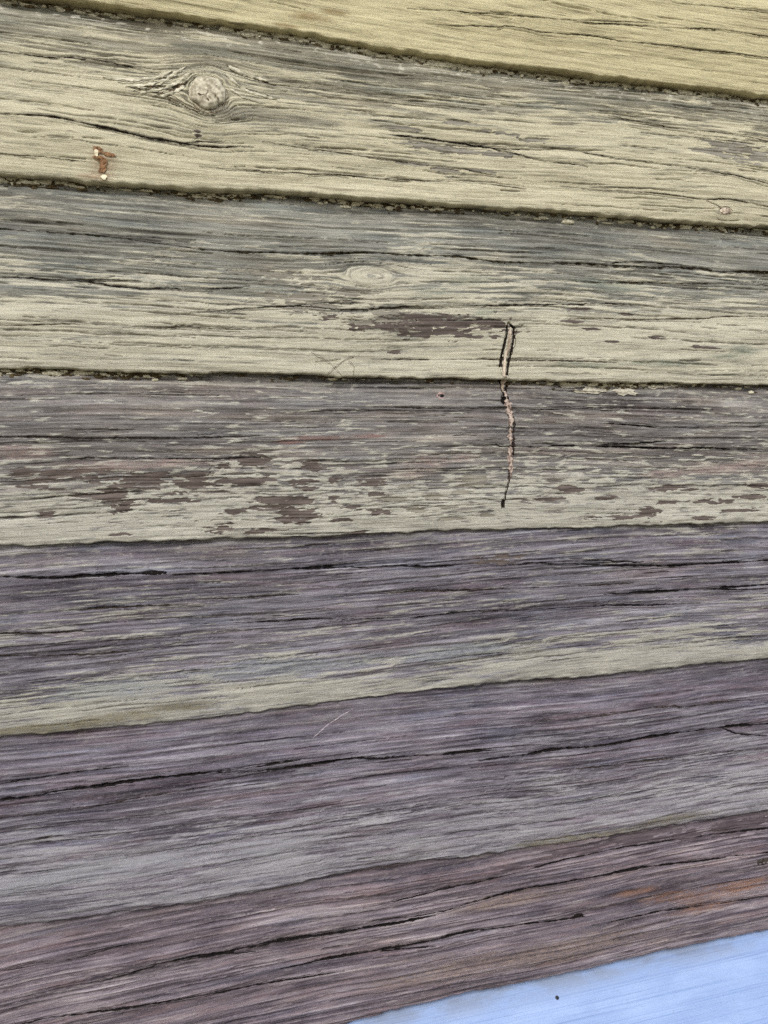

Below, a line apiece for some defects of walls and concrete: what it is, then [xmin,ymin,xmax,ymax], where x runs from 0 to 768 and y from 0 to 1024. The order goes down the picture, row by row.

corrosion [93,146,115,180]
peeling [229,266,530,354]
crack [0,228,768,508]
peeling [10,453,488,535]
peeling [534,485,618,501]
peeling [584,483,768,523]
crack [0,560,768,656]
crack [0,698,768,846]
crack [4,828,768,1024]